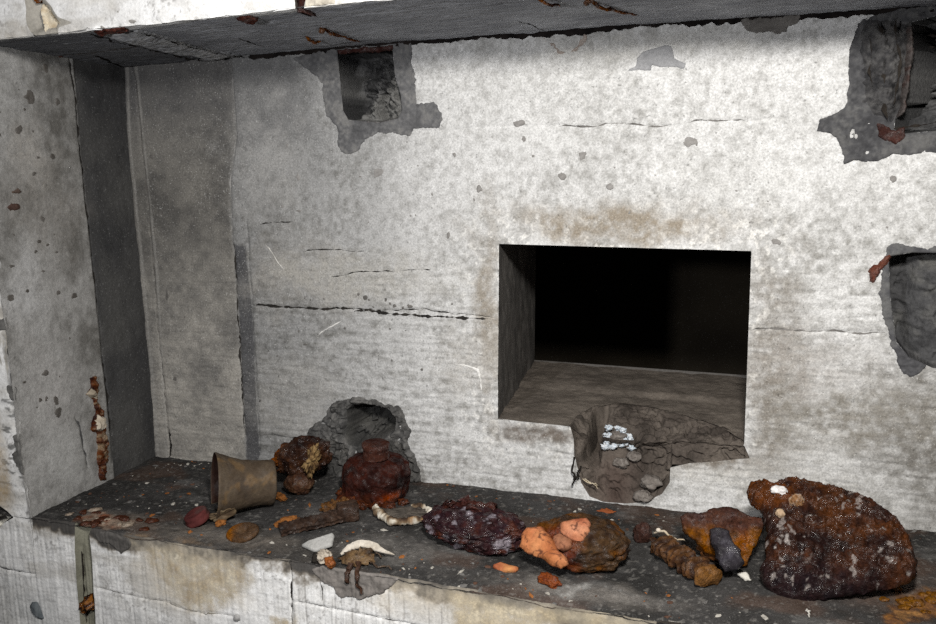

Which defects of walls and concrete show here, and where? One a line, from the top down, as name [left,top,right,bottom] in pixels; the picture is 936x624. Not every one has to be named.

spalling [293,43,443,154]
peeling [628,45,686,71]
spalling [683,137,698,147]
spalling [817,6,936,164]
crack [229,5,936,447]
spalling [868,243,936,377]
spalling [307,397,421,482]